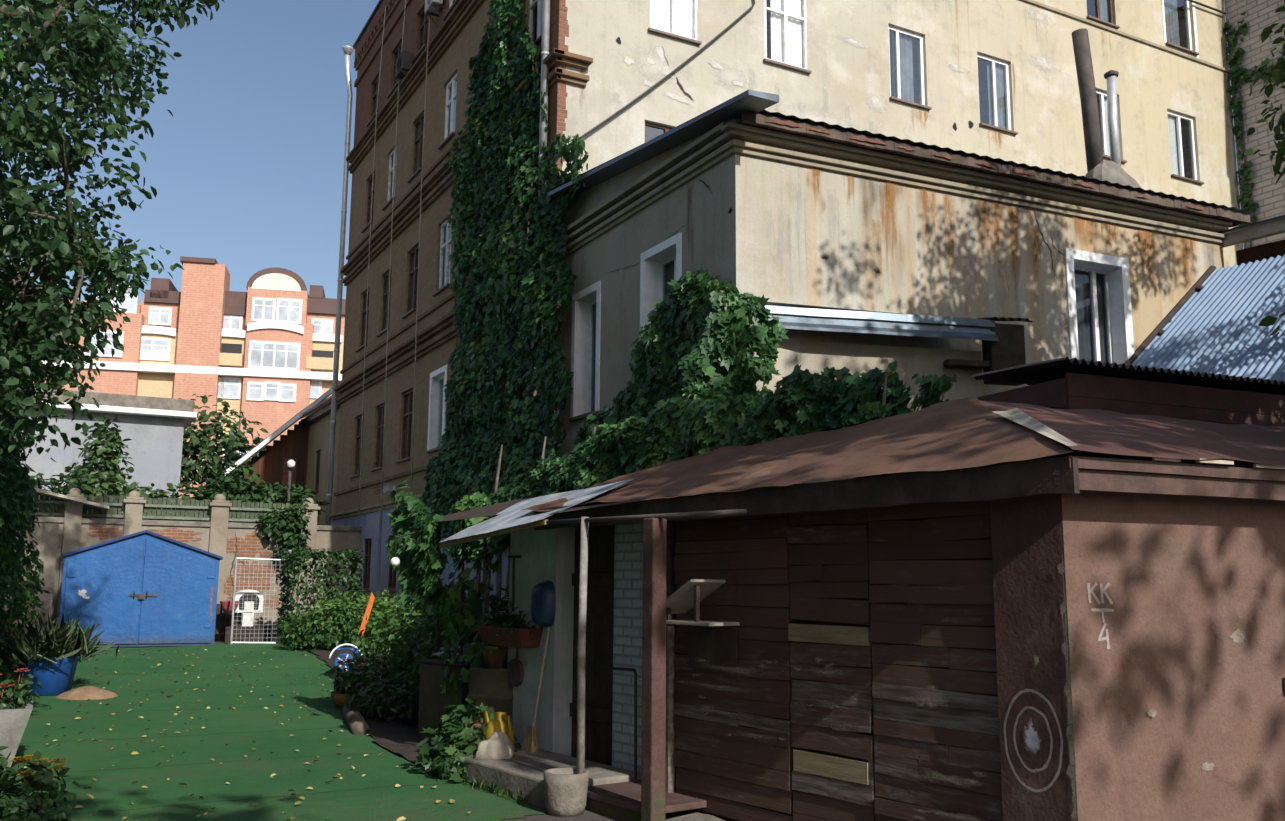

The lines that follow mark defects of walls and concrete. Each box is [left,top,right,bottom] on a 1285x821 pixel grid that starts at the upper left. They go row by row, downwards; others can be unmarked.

peeling [624,45,690,104]
corrosion [981,204,1017,262]
crack [1035,216,1065,279]